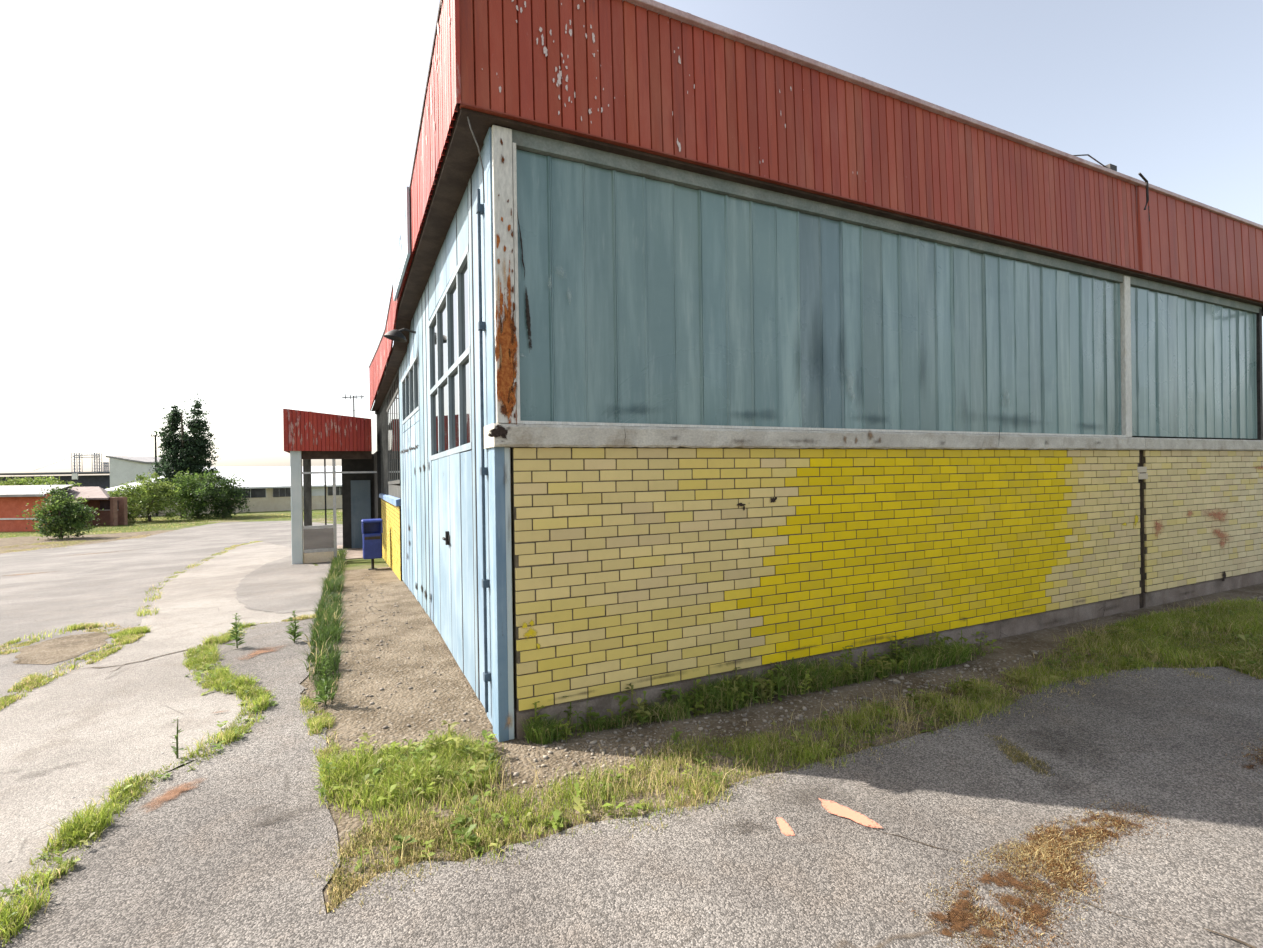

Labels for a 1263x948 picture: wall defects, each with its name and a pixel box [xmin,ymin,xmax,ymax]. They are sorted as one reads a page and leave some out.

peeling [536,0,615,124]
rust [495,195,518,424]
crack [1175,920,1256,948]